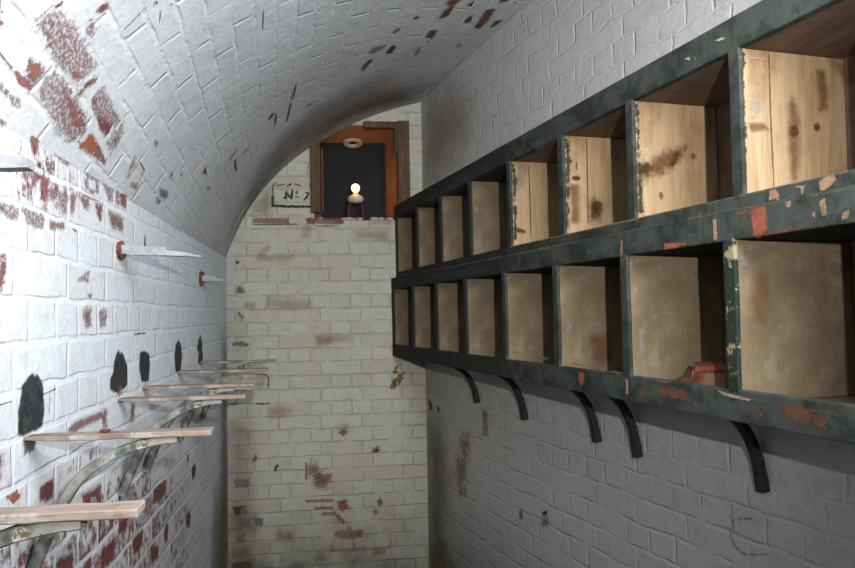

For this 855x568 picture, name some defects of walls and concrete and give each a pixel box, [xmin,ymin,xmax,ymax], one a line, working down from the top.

peeling [414,0,516,55]
peeling [0,0,124,165]
peeling [0,156,145,235]
peeling [40,479,54,502]
peeling [83,484,101,503]
peeling [126,479,166,516]
peeling [305,463,335,515]
peeling [56,553,74,568]
peeling [85,519,127,568]
peeling [133,523,168,562]
peeling [334,529,363,540]